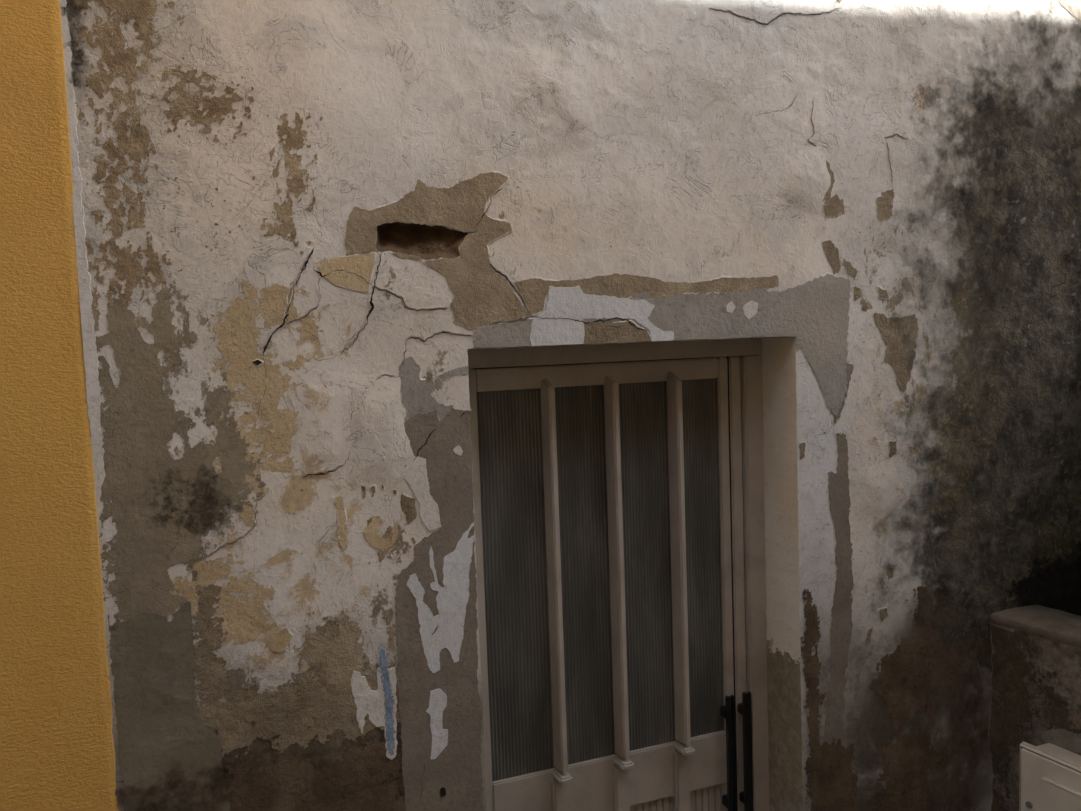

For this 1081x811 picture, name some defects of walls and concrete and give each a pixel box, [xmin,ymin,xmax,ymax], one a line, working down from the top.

crack [710,0,839,25]
peeling [58,0,401,760]
crack [302,409,357,477]
peeling [361,456,441,563]
crack [255,247,647,423]
crack [455,188,502,234]
flaking render [316,171,779,346]
peeling [822,240,919,392]
water stain [900,23,1081,811]
peeling [392,522,474,673]
water stain [116,729,406,811]
peeling [426,688,448,759]